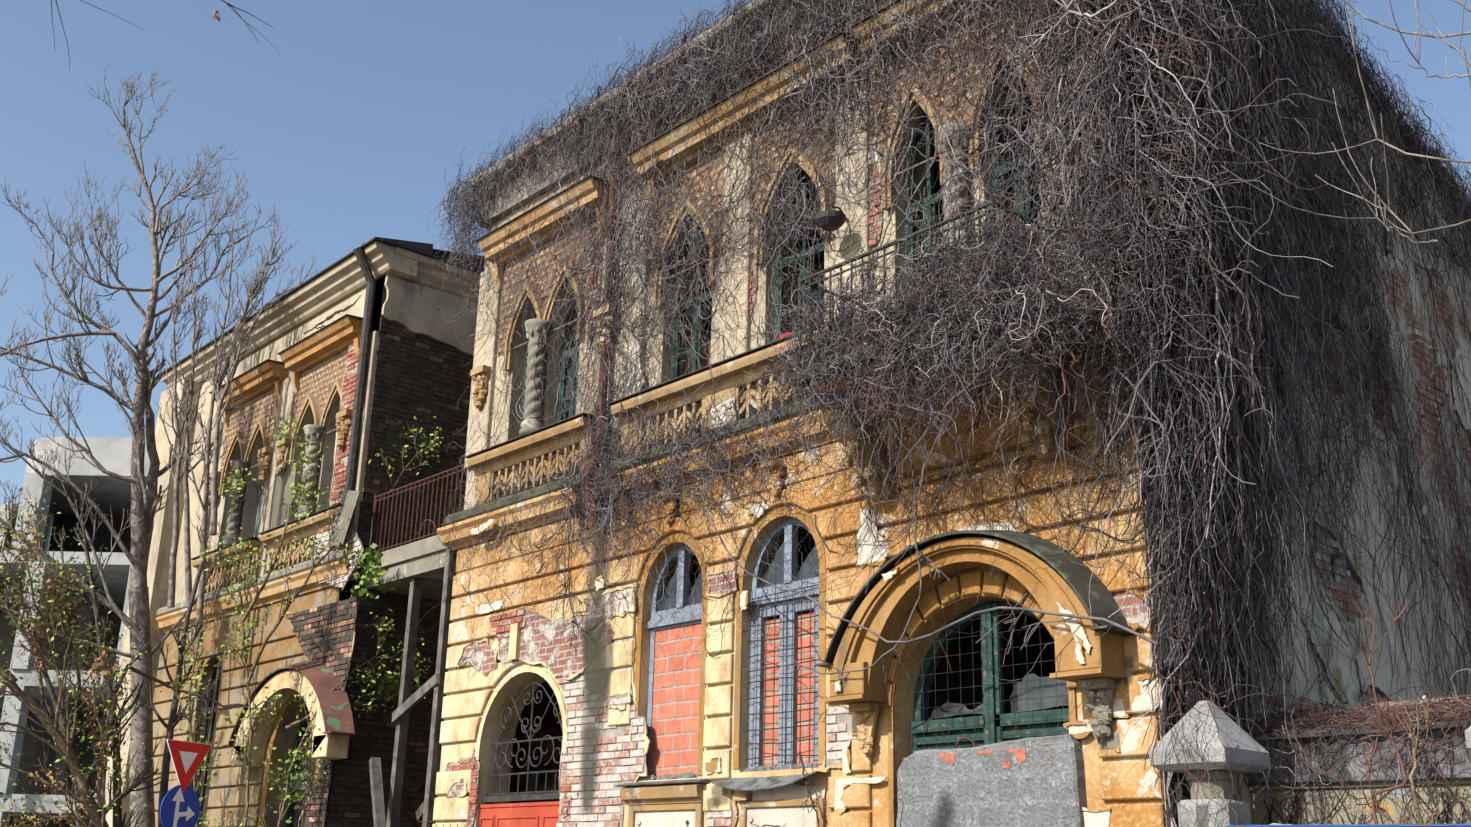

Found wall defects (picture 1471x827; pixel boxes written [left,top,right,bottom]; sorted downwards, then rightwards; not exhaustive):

spalling [1297,256,1471,637]
spalling [853,508,900,582]
spalling [1057,603,1092,664]
spalling [455,575,650,827]
spalling [444,748,480,827]